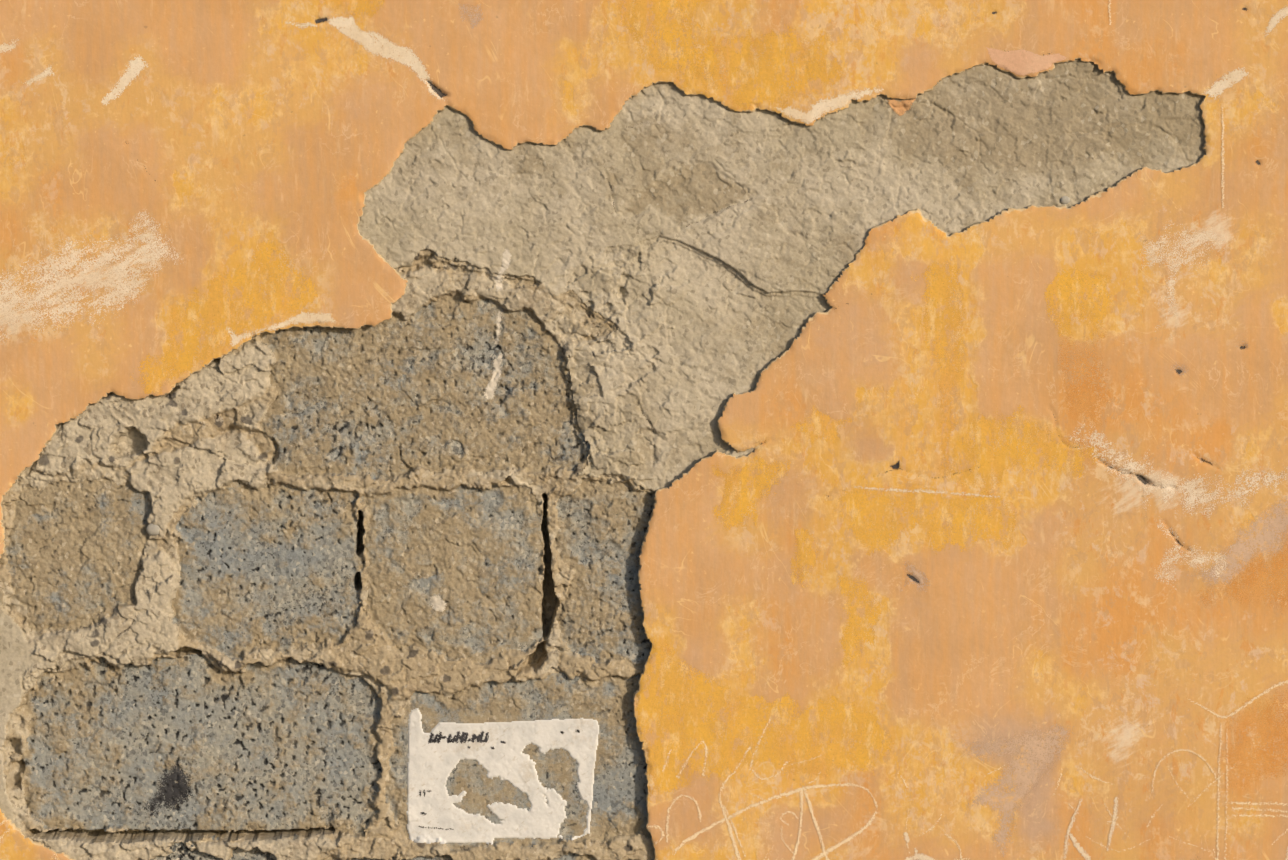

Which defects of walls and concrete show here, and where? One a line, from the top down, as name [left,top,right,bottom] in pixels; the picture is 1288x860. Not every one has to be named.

peeling [101,55,148,105]
peeling [774,86,884,124]
peeling [987,47,1066,76]
peeling [0,209,182,345]
peeling [1140,220,1230,328]
peeling [254,311,336,333]
peeling [712,454,795,531]
flaking render [638,487,669,582]
peeling [901,561,931,592]
peeling [837,573,885,669]
flaking render [445,759,531,824]
flaking render [31,834,185,860]